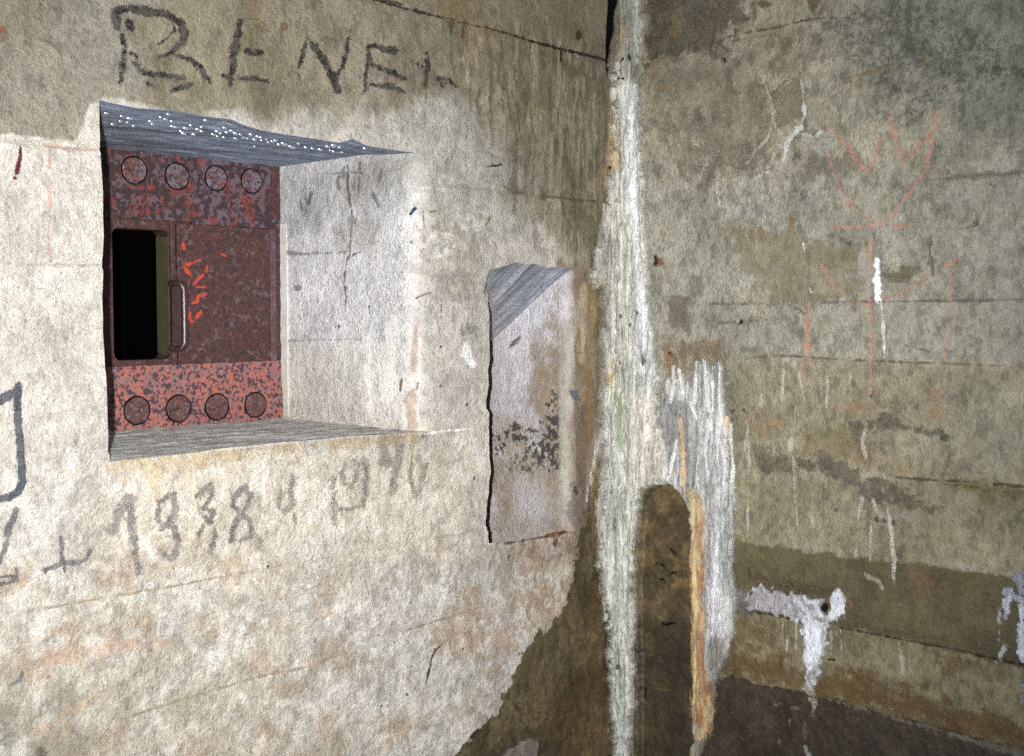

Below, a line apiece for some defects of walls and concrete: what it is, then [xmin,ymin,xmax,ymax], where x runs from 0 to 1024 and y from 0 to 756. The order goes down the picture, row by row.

leakage [454,0,1024,756]
rust [677,409,1024,756]